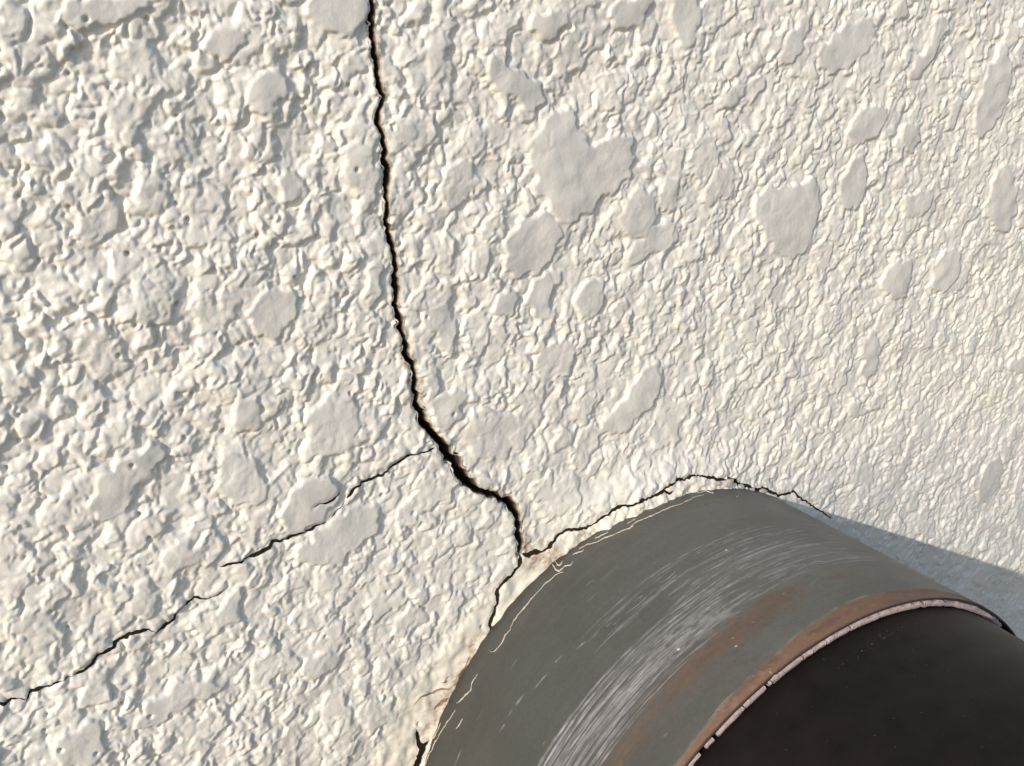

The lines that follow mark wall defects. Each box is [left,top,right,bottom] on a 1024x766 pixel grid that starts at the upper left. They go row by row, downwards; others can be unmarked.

crack [0,0,832,710]
crack [413,730,429,766]